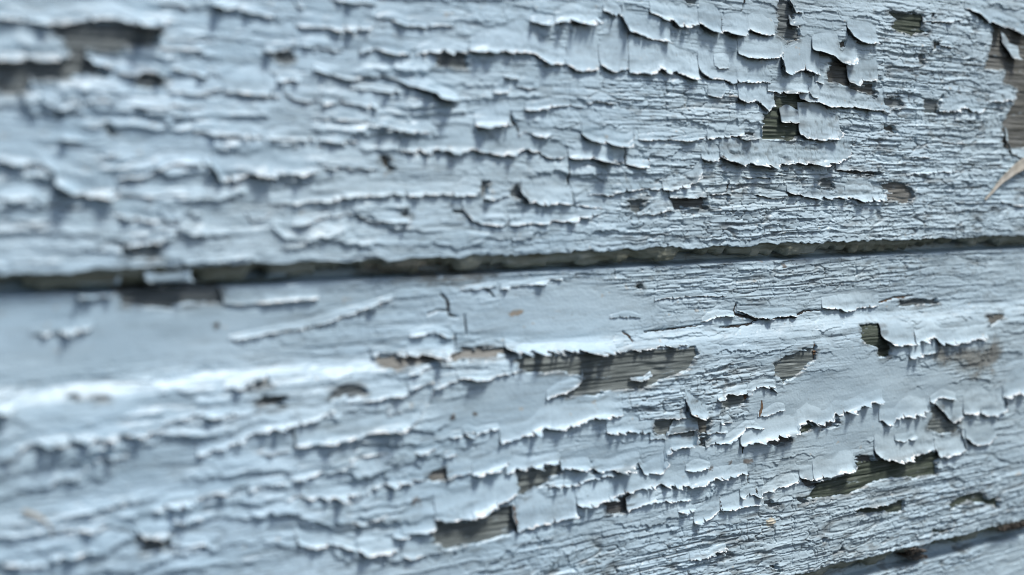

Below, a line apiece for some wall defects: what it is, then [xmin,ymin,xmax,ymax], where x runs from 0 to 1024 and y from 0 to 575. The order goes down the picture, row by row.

peeling [0,0,959,312]
peeling [889,0,1024,158]
peeling [1000,188,1024,206]
peeling [859,314,1004,359]
peeling [0,338,1024,568]